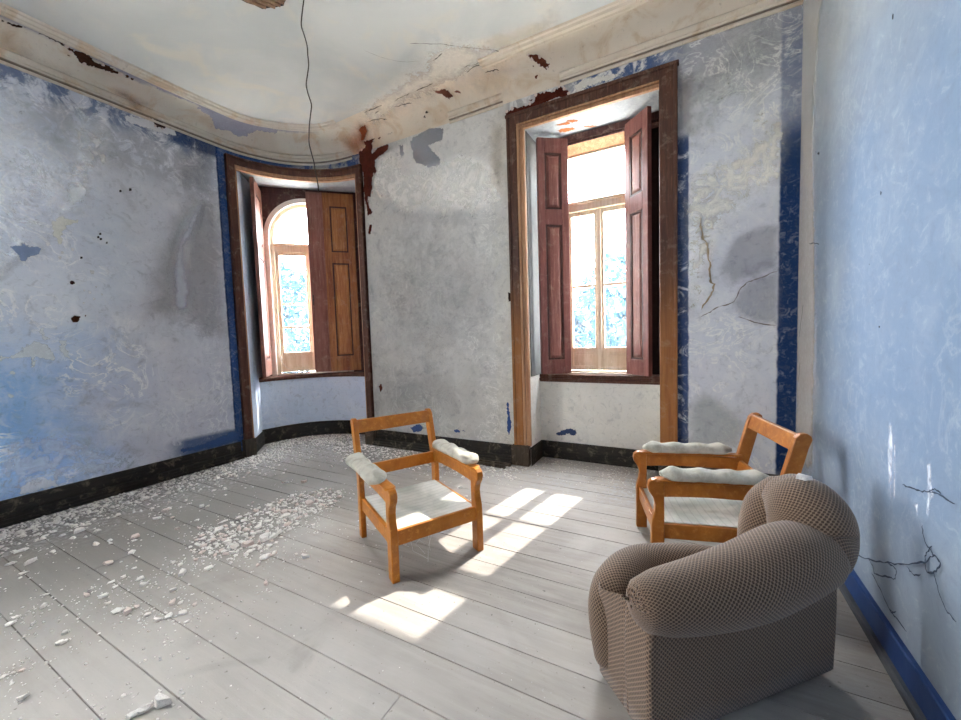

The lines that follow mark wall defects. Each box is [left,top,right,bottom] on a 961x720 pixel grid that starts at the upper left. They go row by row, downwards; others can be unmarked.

crack [371,43,499,73]
spalling [528,53,550,79]
peeling [61,43,278,136]
crack [366,84,431,122]
spalling [505,74,618,115]
peeling [359,111,443,234]
peeling [11,217,83,261]
crack [701,272,773,325]
crack [903,484,954,504]
crack [859,525,956,632]